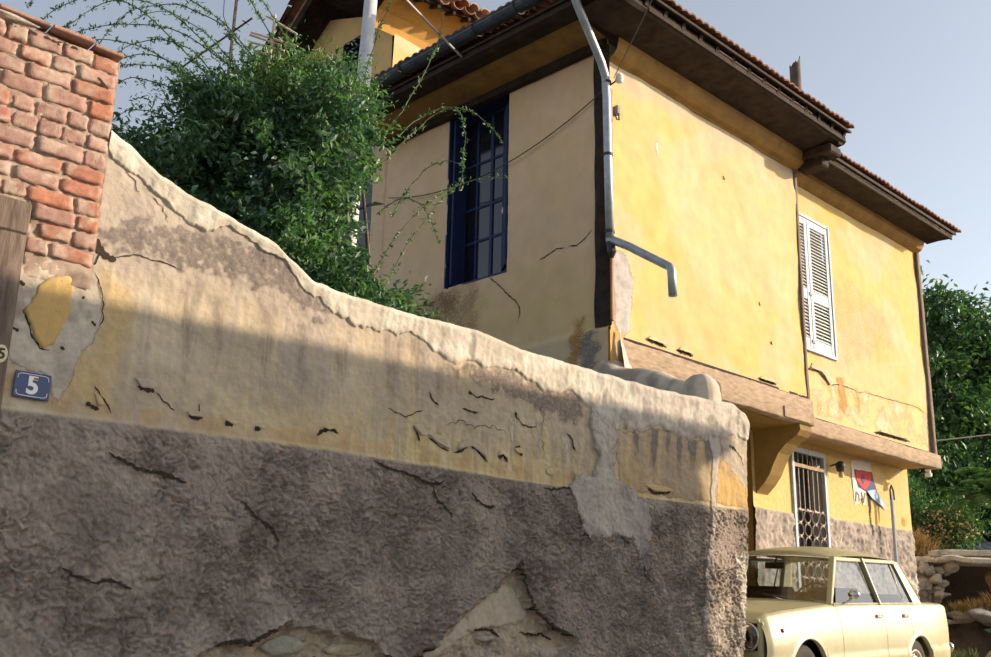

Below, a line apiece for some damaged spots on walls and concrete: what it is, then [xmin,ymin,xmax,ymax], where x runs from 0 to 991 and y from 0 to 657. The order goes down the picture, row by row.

crack [93,239,182,270]
peeling [9,259,105,400]
leakage [416,288,478,329]
crack [489,277,520,318]
leakage [568,318,599,369]
leakage [453,363,583,461]
spalling [498,445,523,462]
leakage [616,428,724,503]
spalling [416,559,574,657]
spalling [195,626,392,657]